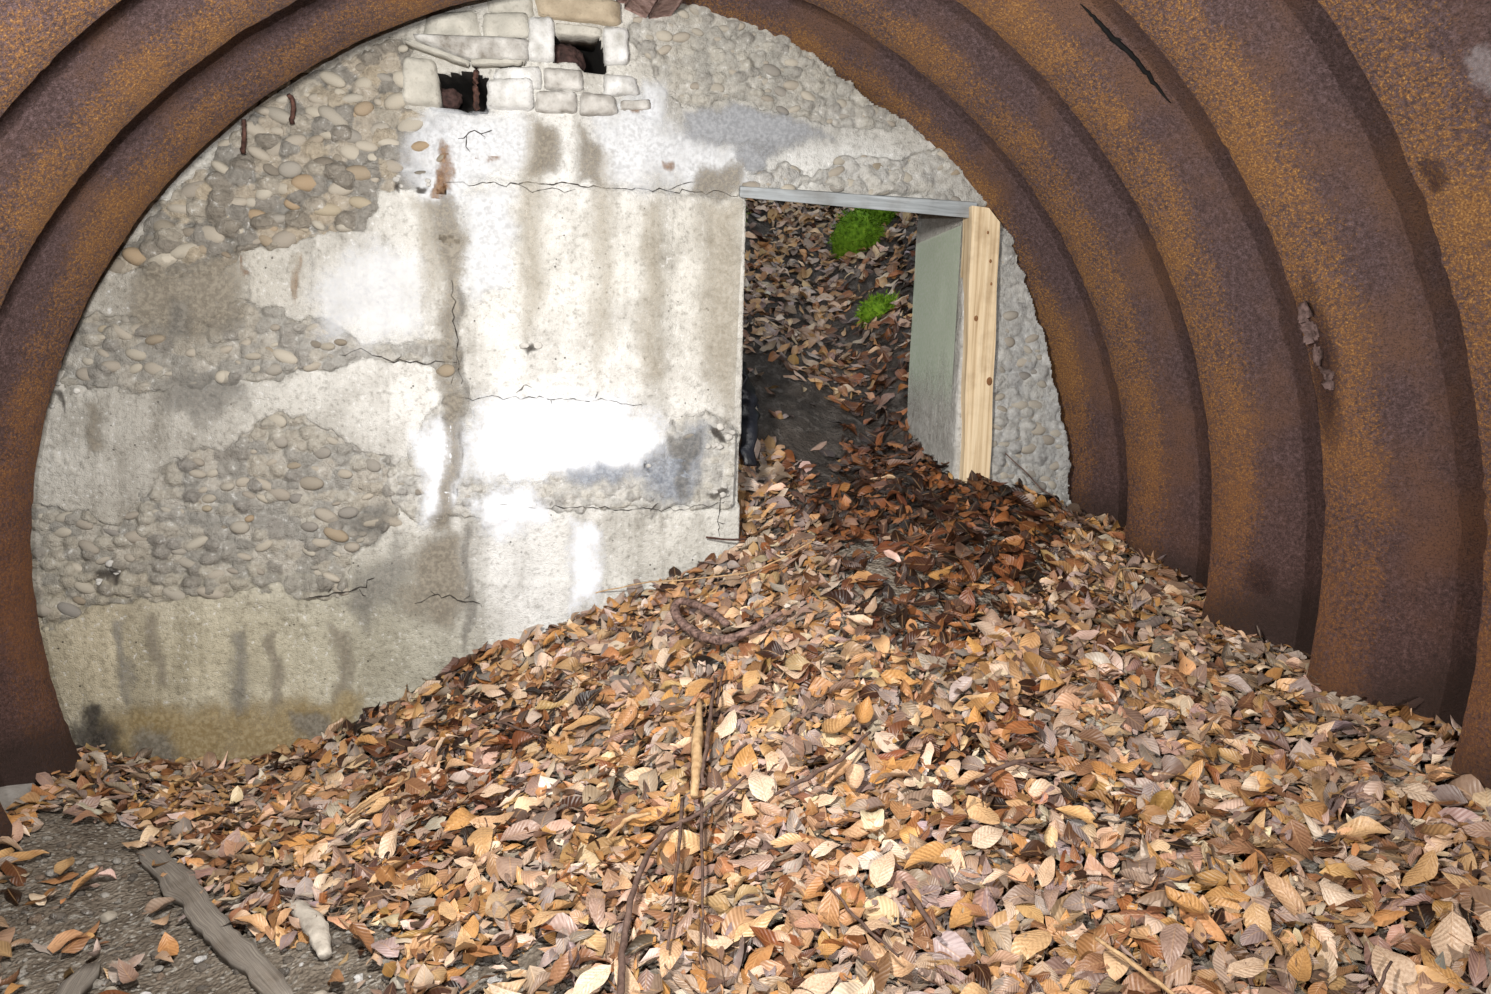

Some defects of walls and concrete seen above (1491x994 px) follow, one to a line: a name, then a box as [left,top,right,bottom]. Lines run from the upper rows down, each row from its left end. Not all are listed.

corrosion [432,145,454,199]
water stain [581,85,744,388]
water stain [404,108,704,624]
corrosion [1297,300,1336,390]
spalling [96,560,121,586]
water stain [72,620,361,764]